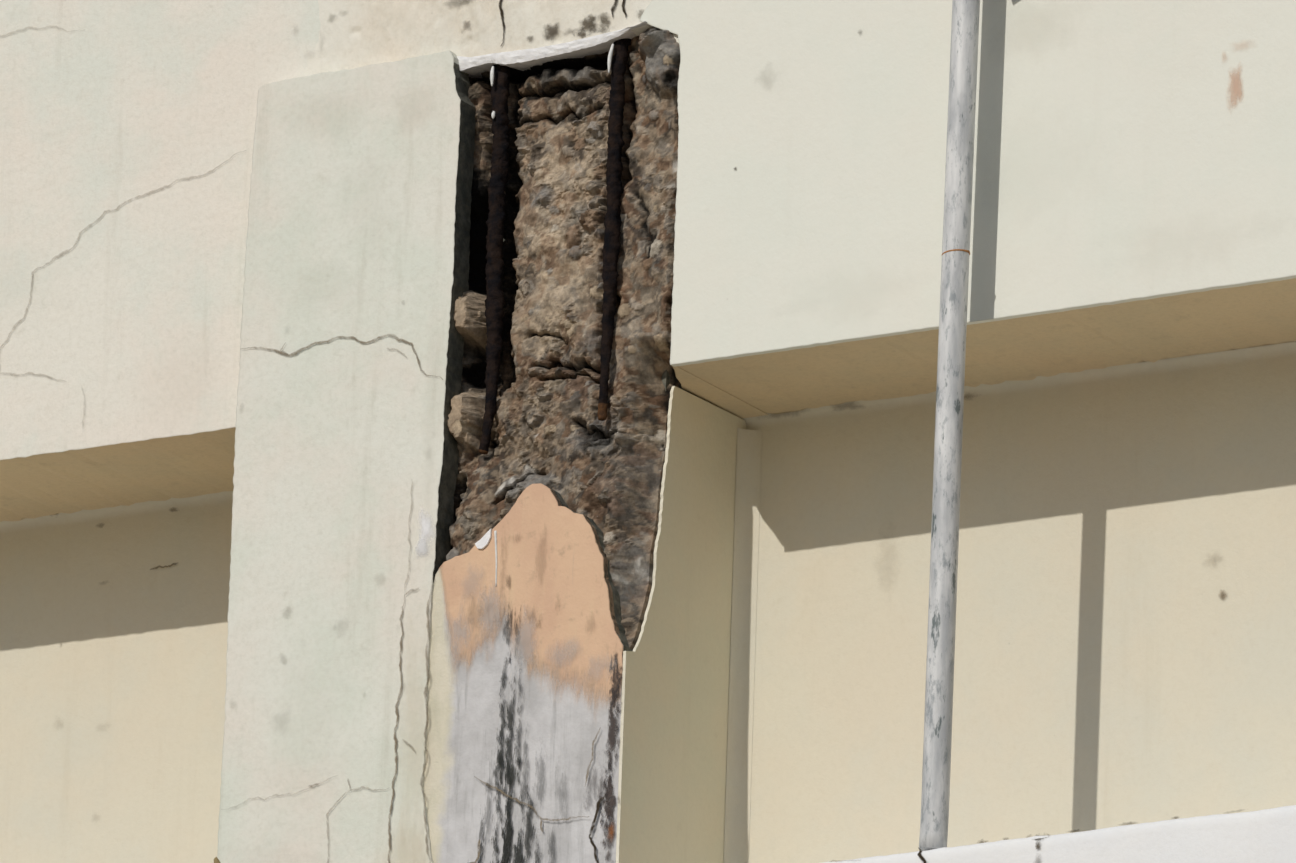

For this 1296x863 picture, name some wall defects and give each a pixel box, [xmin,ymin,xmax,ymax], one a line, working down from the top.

crack [498,0,506,46]
crack [248,334,443,380]
spalling [424,16,681,863]
crack [388,593,429,863]
water stain [478,661,542,863]
water stain [599,656,622,861]